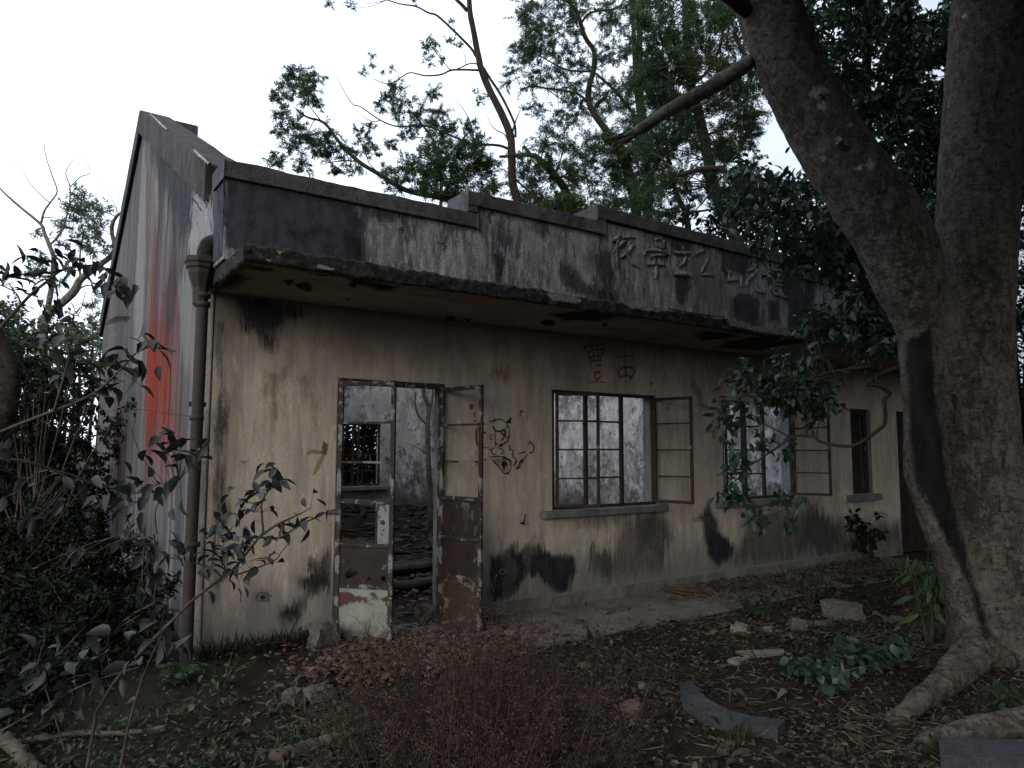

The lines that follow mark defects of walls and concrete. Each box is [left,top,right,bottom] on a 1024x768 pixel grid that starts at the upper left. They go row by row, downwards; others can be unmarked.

leakage [214,267,302,350]
leakage [493,250,503,283]
leakage [671,238,815,350]
leakage [697,504,854,565]
leakage [281,551,331,621]
leakage [490,541,575,600]